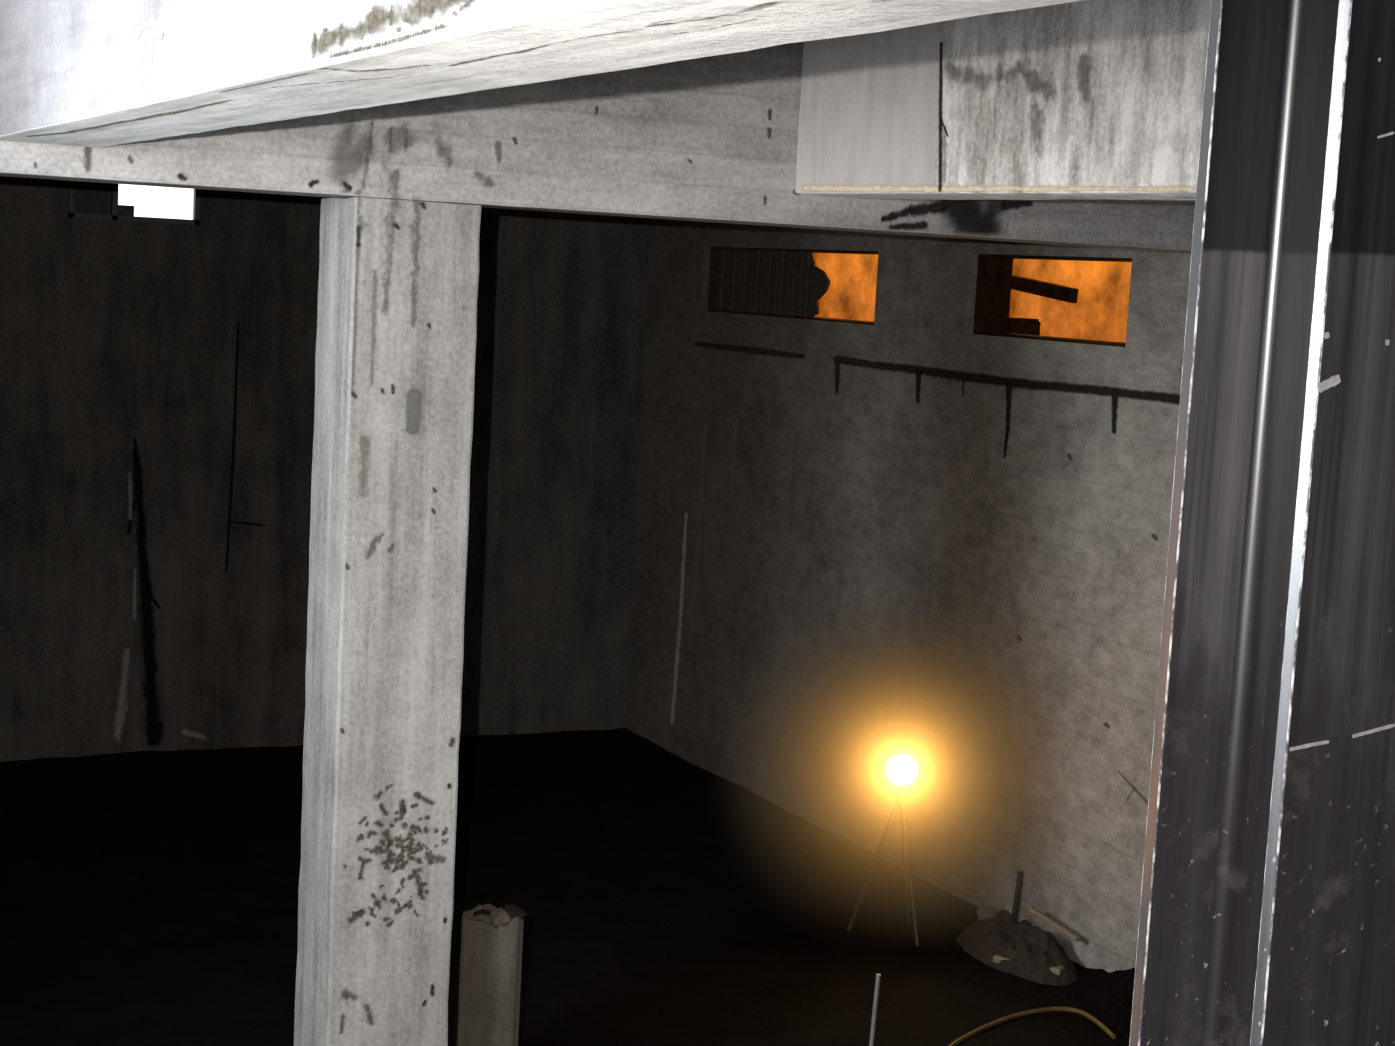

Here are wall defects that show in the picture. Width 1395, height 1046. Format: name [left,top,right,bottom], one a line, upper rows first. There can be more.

crack [127,438,163,746]